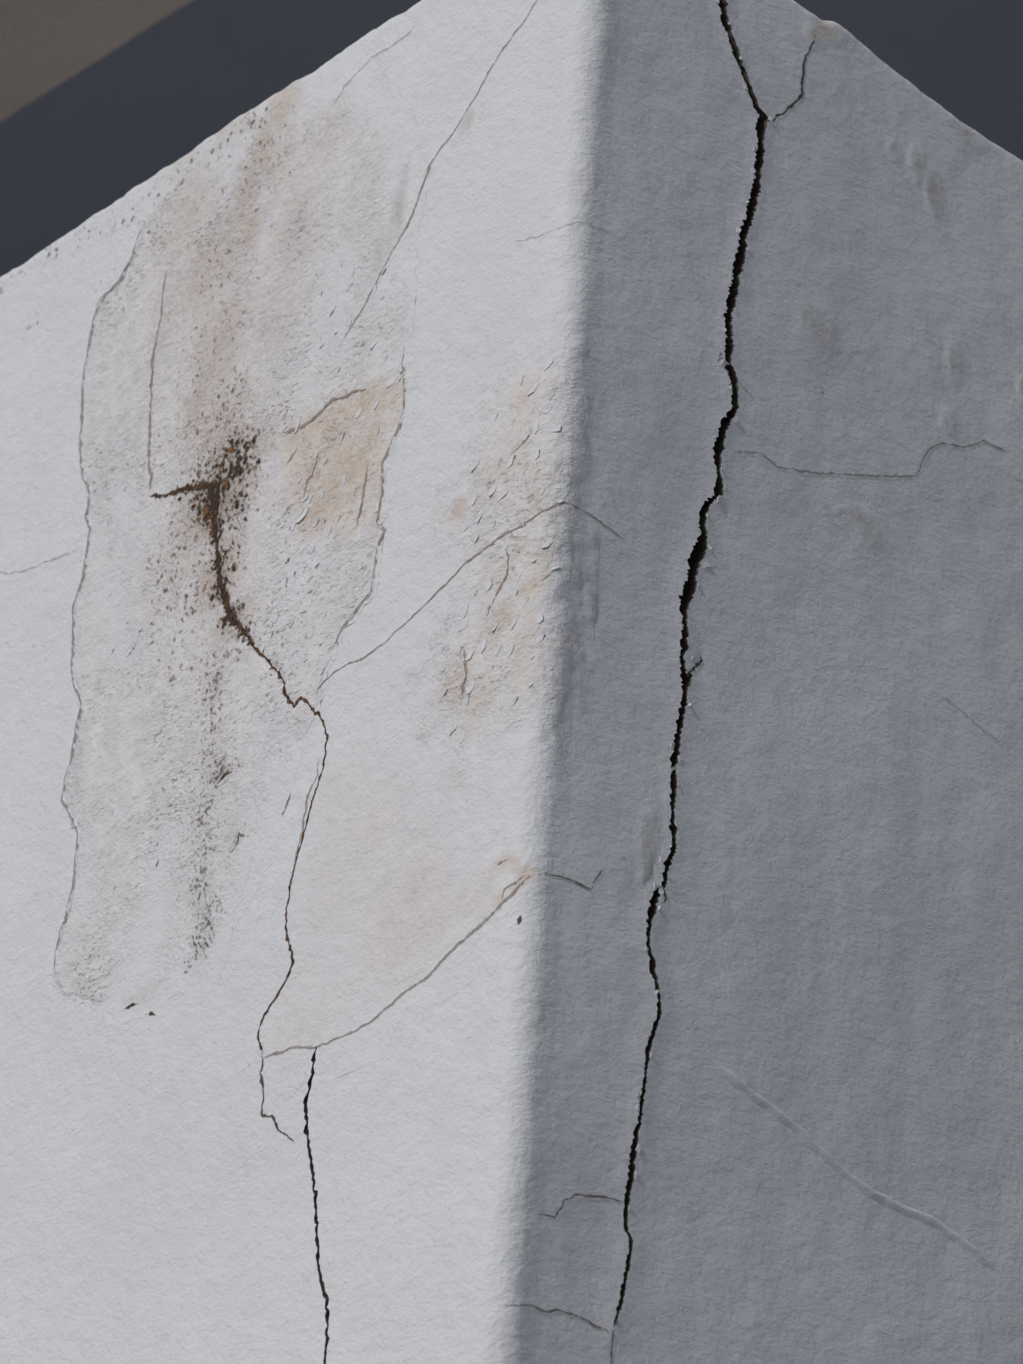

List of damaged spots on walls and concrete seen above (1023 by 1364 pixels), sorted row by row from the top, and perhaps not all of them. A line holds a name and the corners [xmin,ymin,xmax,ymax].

peeling [50,219,196,1010]
corrosion [97,221,328,706]
damp [45,44,383,468]
damp [95,385,548,1101]
peeling [231,39,427,937]
crack [147,274,628,1364]
damp [358,130,421,345]
crack [343,0,537,339]
crack [506,0,1009,1364]